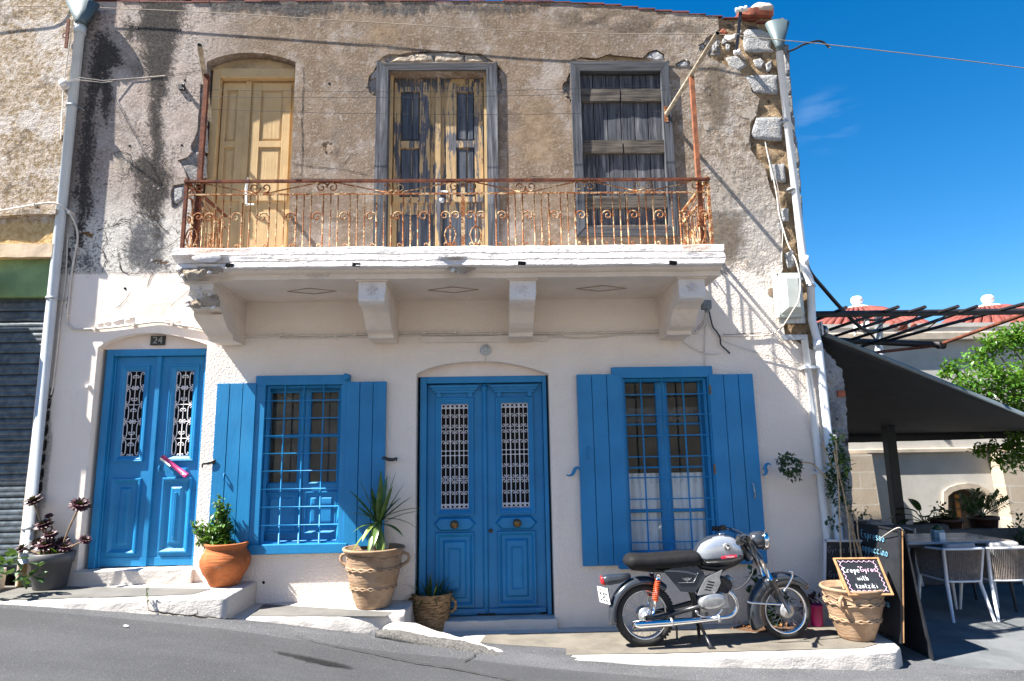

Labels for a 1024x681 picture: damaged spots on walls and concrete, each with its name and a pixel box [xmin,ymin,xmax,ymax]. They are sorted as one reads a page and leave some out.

water stain [70,0,187,275]
flaking render [366,51,504,95]
flaking render [561,51,691,100]
flaking render [698,18,814,351]